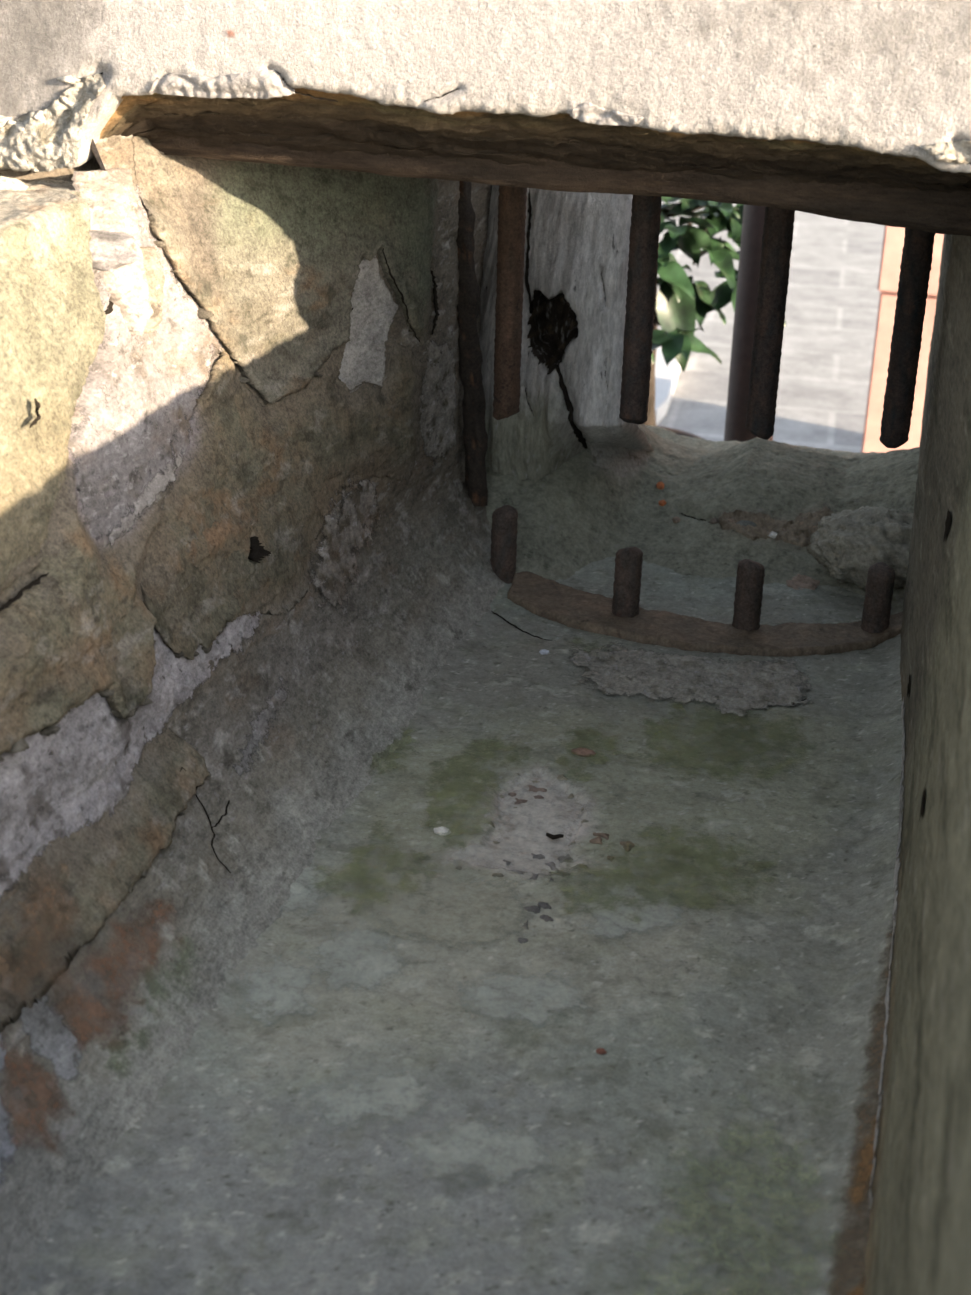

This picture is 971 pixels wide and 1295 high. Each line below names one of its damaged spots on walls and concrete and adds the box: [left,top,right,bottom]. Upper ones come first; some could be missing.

crack [525,188,533,314]
crack [556,356,588,449]
crack [0,572,49,612]
peeling [0,69,971,1083]
crack [180,767,231,873]
peeling [869,697,906,1210]
peeling [0,1097,20,1184]
corrosion [828,926,895,1295]